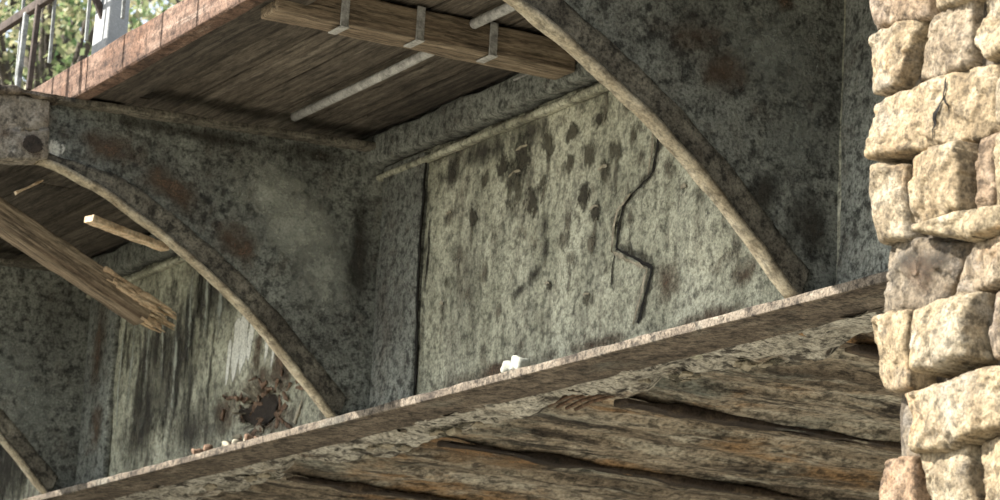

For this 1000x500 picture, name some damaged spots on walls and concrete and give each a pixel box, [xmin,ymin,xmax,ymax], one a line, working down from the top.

crack [932,77,950,140]
leakage [440,138,502,185]
leakage [514,217,548,295]
crack [611,133,661,325]
leakage [116,274,230,453]
leakage [225,315,255,386]
rust [246,334,289,400]
leakage [0,444,25,500]